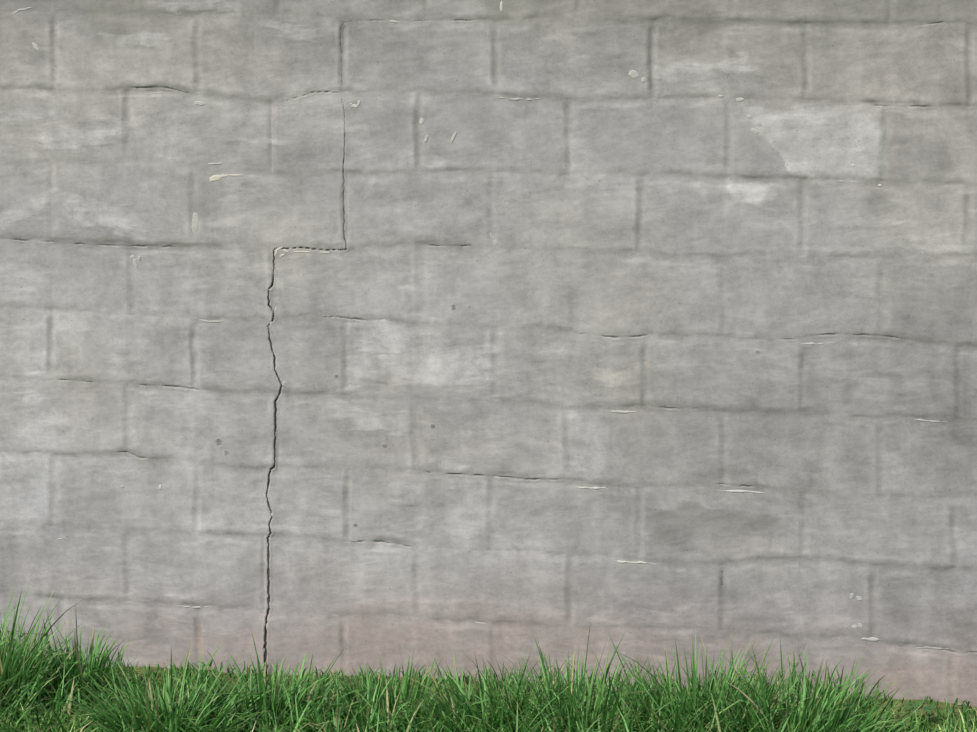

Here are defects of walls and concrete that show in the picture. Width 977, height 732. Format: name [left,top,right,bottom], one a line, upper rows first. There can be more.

crack [263,147,347,673]